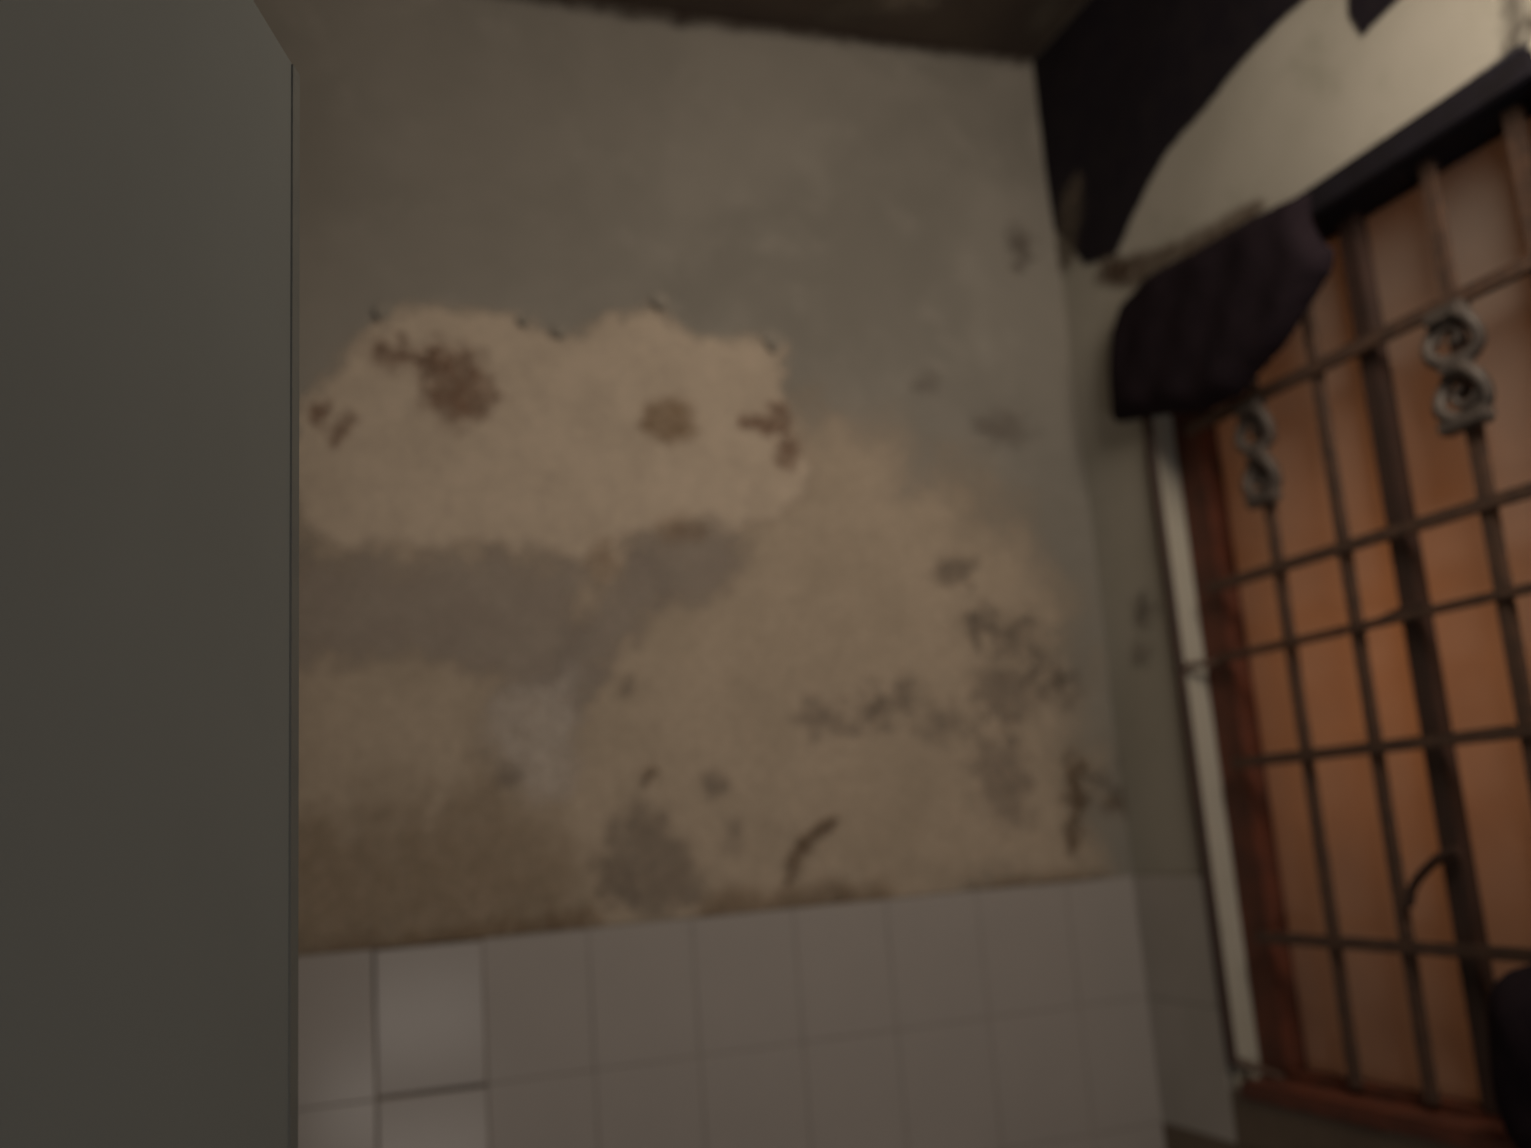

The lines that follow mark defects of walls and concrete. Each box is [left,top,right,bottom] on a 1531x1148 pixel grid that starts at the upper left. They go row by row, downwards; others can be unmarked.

peeling [1032,0,1304,268]
peeling [1348,0,1397,35]
peeling [298,292,1101,953]